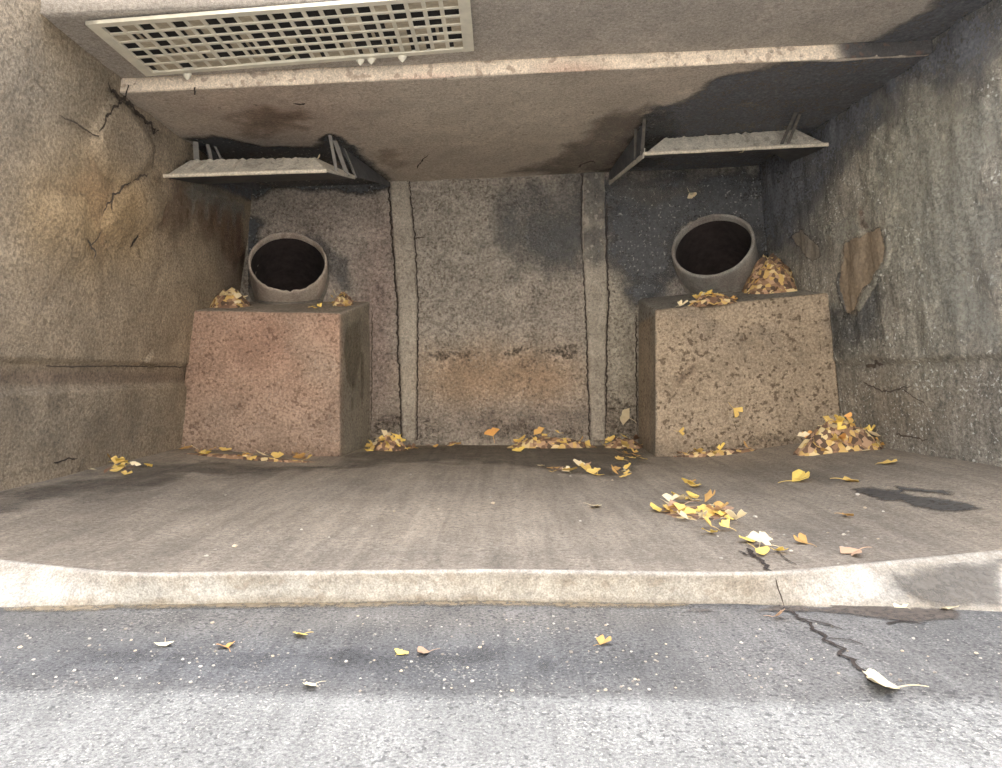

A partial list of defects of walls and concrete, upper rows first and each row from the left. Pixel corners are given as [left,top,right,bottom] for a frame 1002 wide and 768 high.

crack [59,82,159,137]
crack [87,174,148,260]
crack [370,155,428,440]
crack [579,161,610,440]
spalling [836,222,893,316]
crack [864,360,927,407]
crack [896,433,927,441]
damp [855,486,978,510]
crack [740,548,885,687]